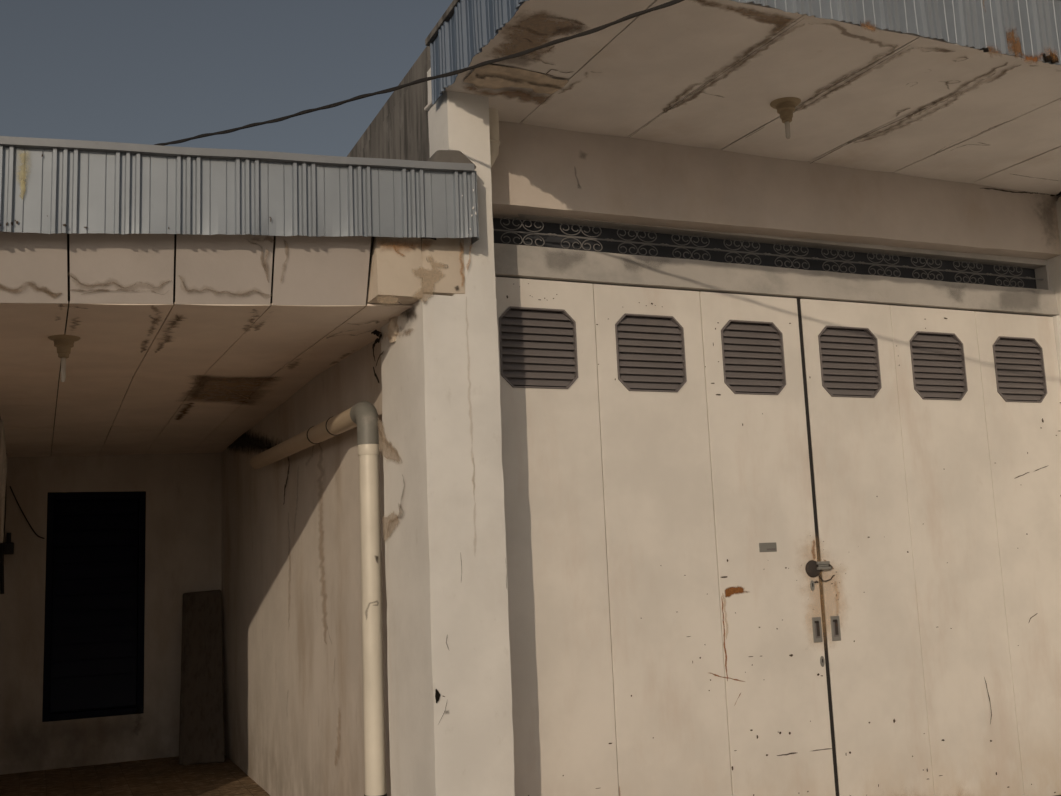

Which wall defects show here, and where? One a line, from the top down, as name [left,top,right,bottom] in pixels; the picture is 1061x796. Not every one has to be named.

water stain [496,13,583,65]
water stain [630,0,803,137]
corrosion [980,31,1059,64]
water stain [176,376,268,420]
corrosion [710,596,745,704]